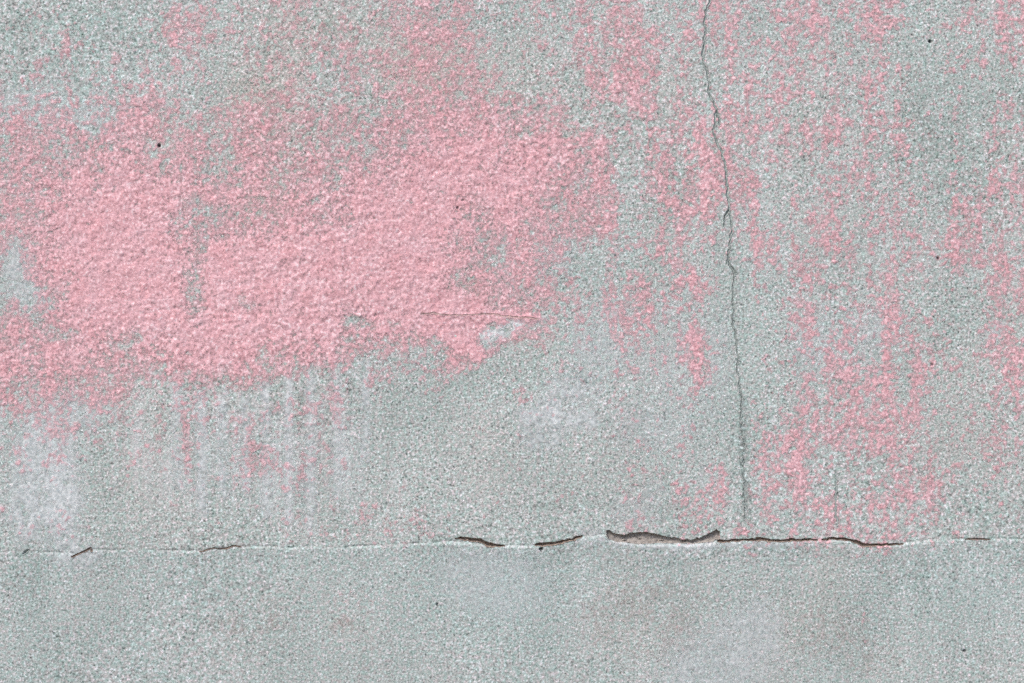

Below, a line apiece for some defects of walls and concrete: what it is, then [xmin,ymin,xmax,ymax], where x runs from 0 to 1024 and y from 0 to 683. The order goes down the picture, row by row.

crack [701,0,904,547]
crack [199,544,241,552]
crack [455,537,505,548]
crack [535,536,583,547]